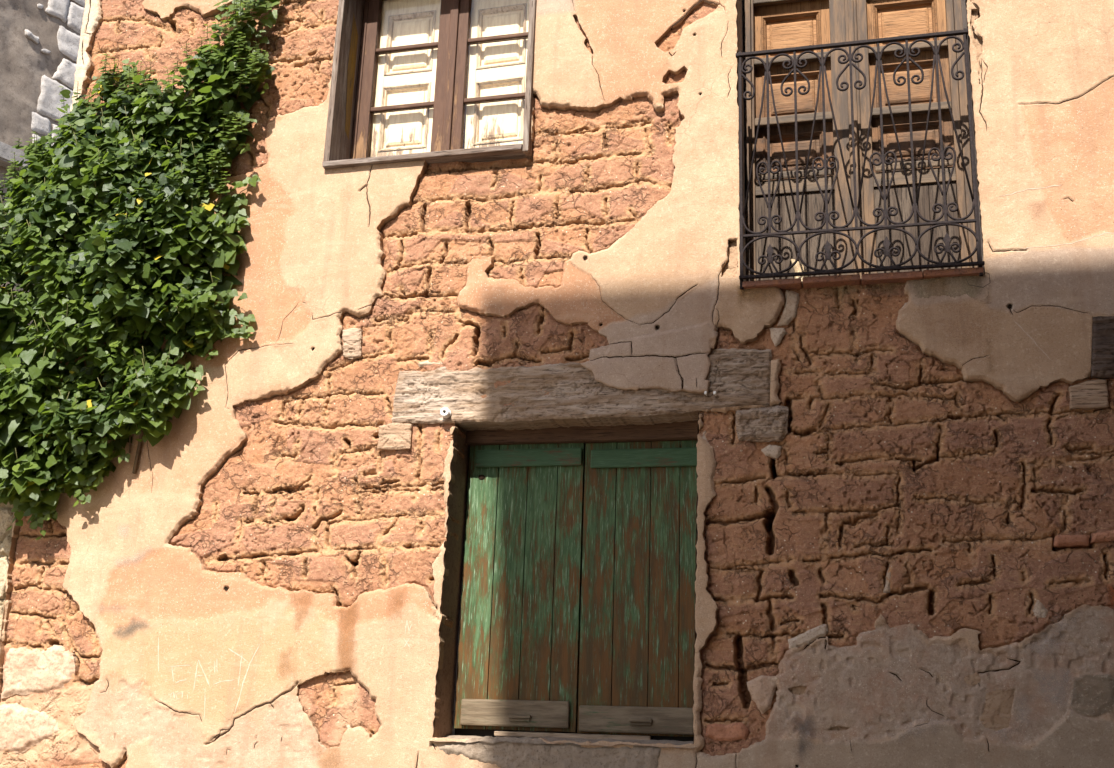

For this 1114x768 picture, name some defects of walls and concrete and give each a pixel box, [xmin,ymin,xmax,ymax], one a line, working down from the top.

spalling [85,0,339,182]
crack [972,2,988,130]
crack [1033,76,1113,104]
crack [360,167,372,224]
spalling [169,70,687,608]
spalling [698,283,1114,756]
spalling [0,504,127,768]
crack [156,683,298,754]
spalling [298,671,381,749]